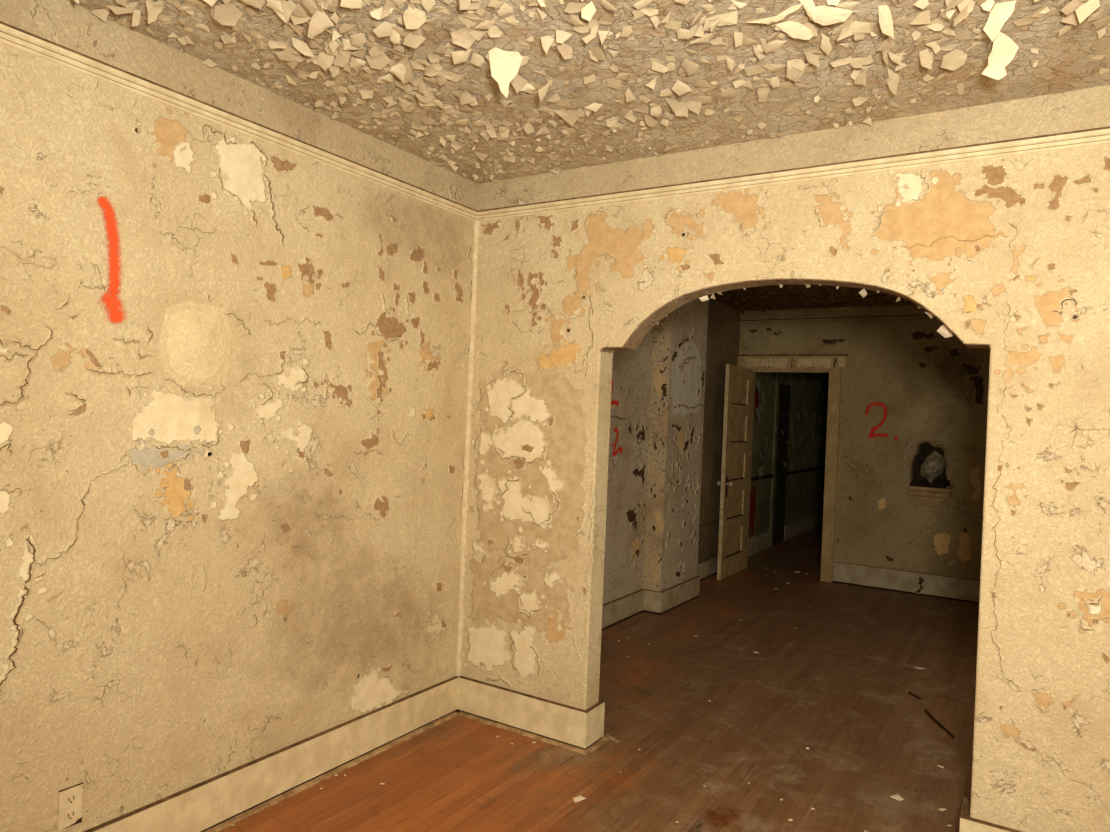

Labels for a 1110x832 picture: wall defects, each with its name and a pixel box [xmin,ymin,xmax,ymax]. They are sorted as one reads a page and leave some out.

peeling [74,0,1110,185]
peeling [132,107,296,246]
peeling [297,203,345,239]
peeling [869,156,1110,296]
peeling [57,279,106,321]
peeling [0,303,264,527]
peeling [239,232,463,474]
peeling [462,186,1084,688]
crack [0,460,129,728]
peeling [1055,584,1110,634]
peeling [344,659,409,715]